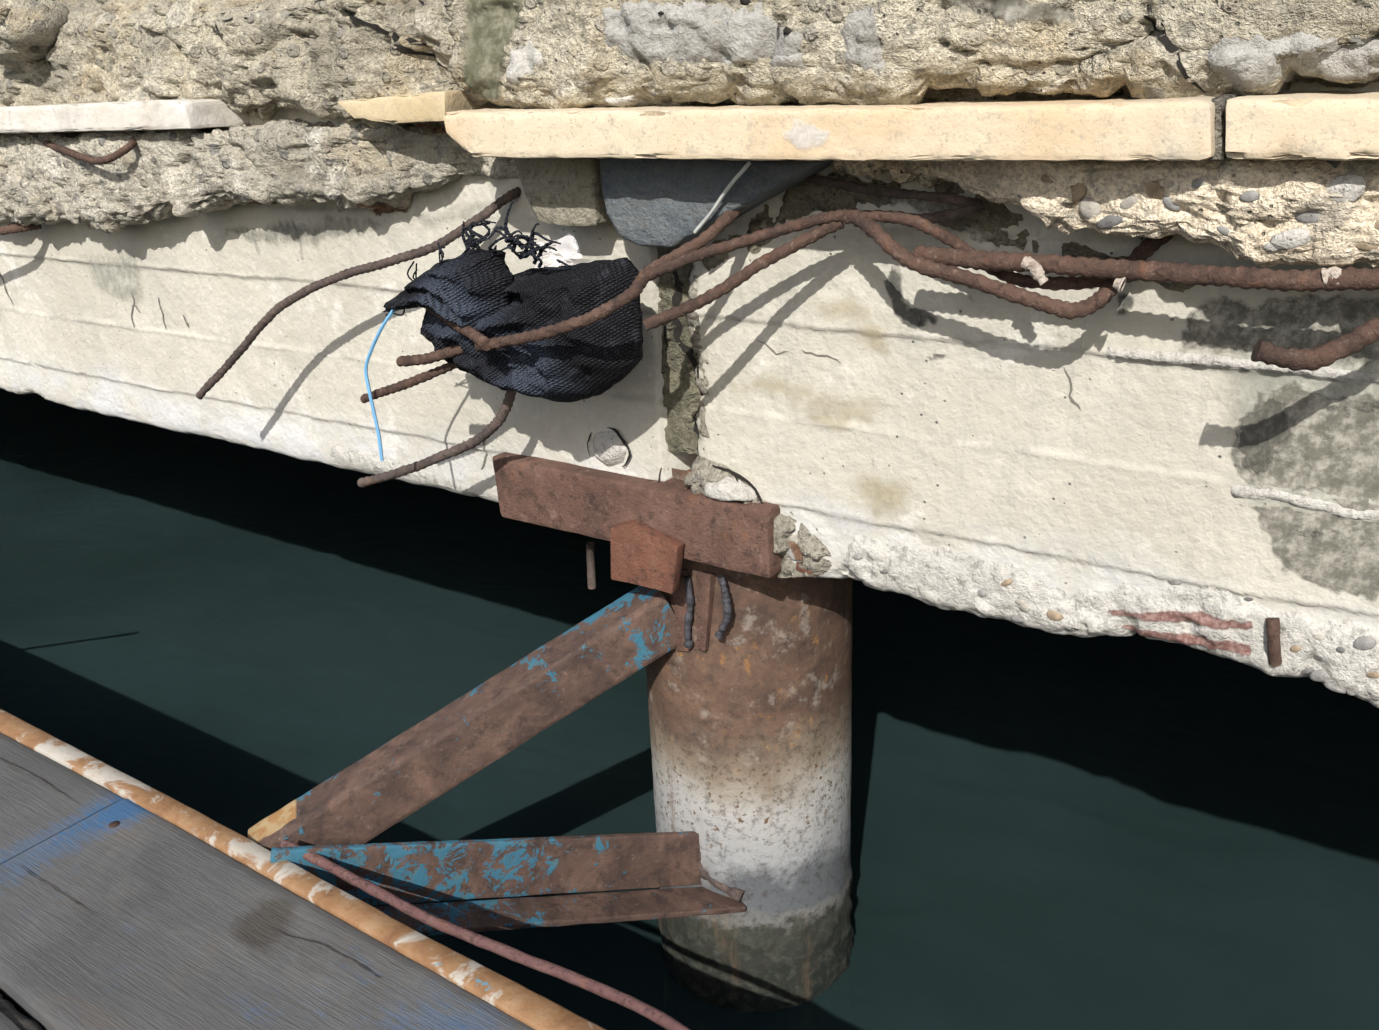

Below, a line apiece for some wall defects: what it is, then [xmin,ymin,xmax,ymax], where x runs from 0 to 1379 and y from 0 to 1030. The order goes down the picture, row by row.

peeling [505,40,543,86]
peeling [603,95,650,107]
crack [1144,15,1206,93]
spalling [0,118,520,234]
corrosion [357,204,407,216]
spalling [687,158,1379,439]
crack [664,270,764,504]
water stain [1183,266,1379,601]
spalling [773,511,1379,708]
corrosion [1109,610,1252,656]